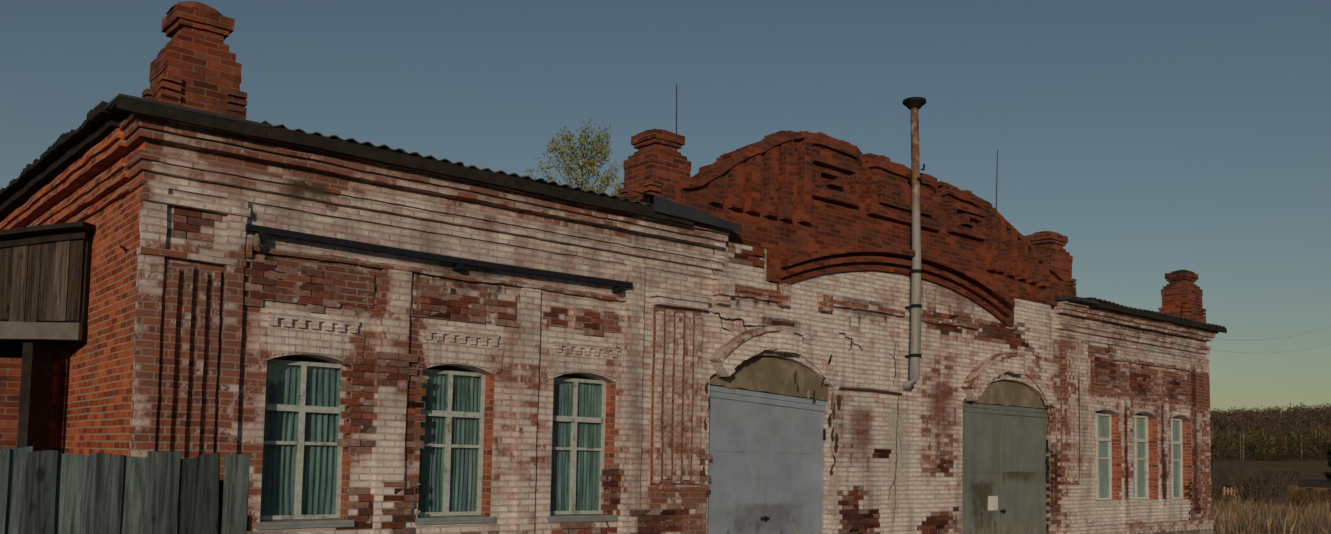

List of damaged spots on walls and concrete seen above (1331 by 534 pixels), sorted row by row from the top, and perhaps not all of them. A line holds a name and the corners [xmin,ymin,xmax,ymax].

peeling [166,207,223,243]
peeling [243,253,382,313]
crack [706,311,765,332]
peeling [1088,344,1182,399]
peeling [337,351,429,455]
flaking render [789,370,841,475]
peeling [551,382,712,534]
peeling [837,486,880,534]
peeling [922,450,954,477]
peeling [917,507,959,534]
peeling [1049,442,1061,524]
peeling [1190,478,1204,520]